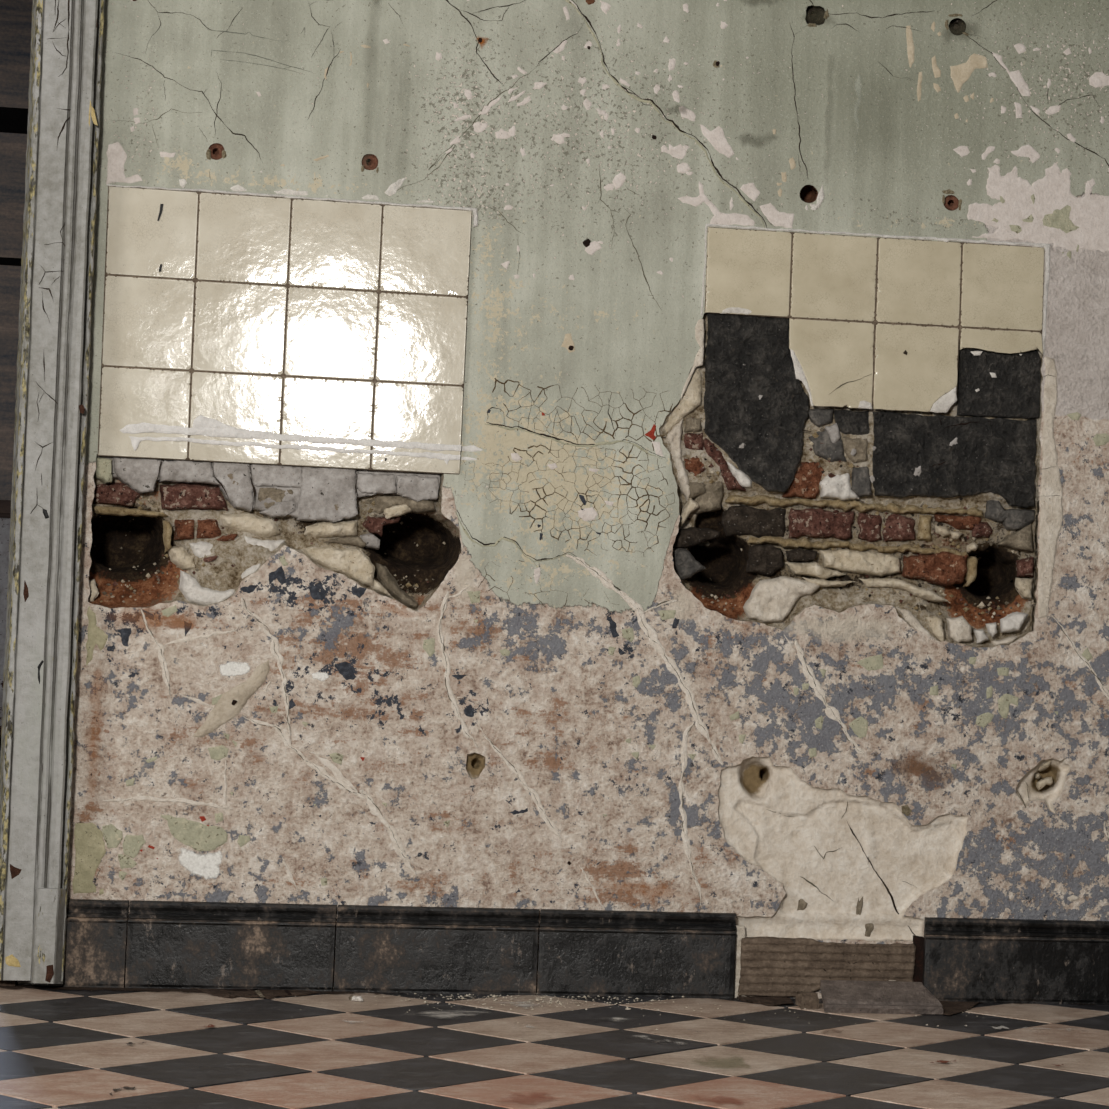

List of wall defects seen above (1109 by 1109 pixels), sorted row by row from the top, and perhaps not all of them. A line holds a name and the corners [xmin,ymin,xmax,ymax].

crack [112,2,263,163]
crack [308,4,339,119]
crack [398,0,775,228]
peeling [661,144,825,228]
crack [790,0,932,180]
peeling [942,144,1109,259]
crack [970,0,1109,166]
spalling [88,454,462,636]
spalling [645,307,1081,665]
peeling [312,661,356,691]
crack [437,378,723,909]
spalling [718,756,968,998]